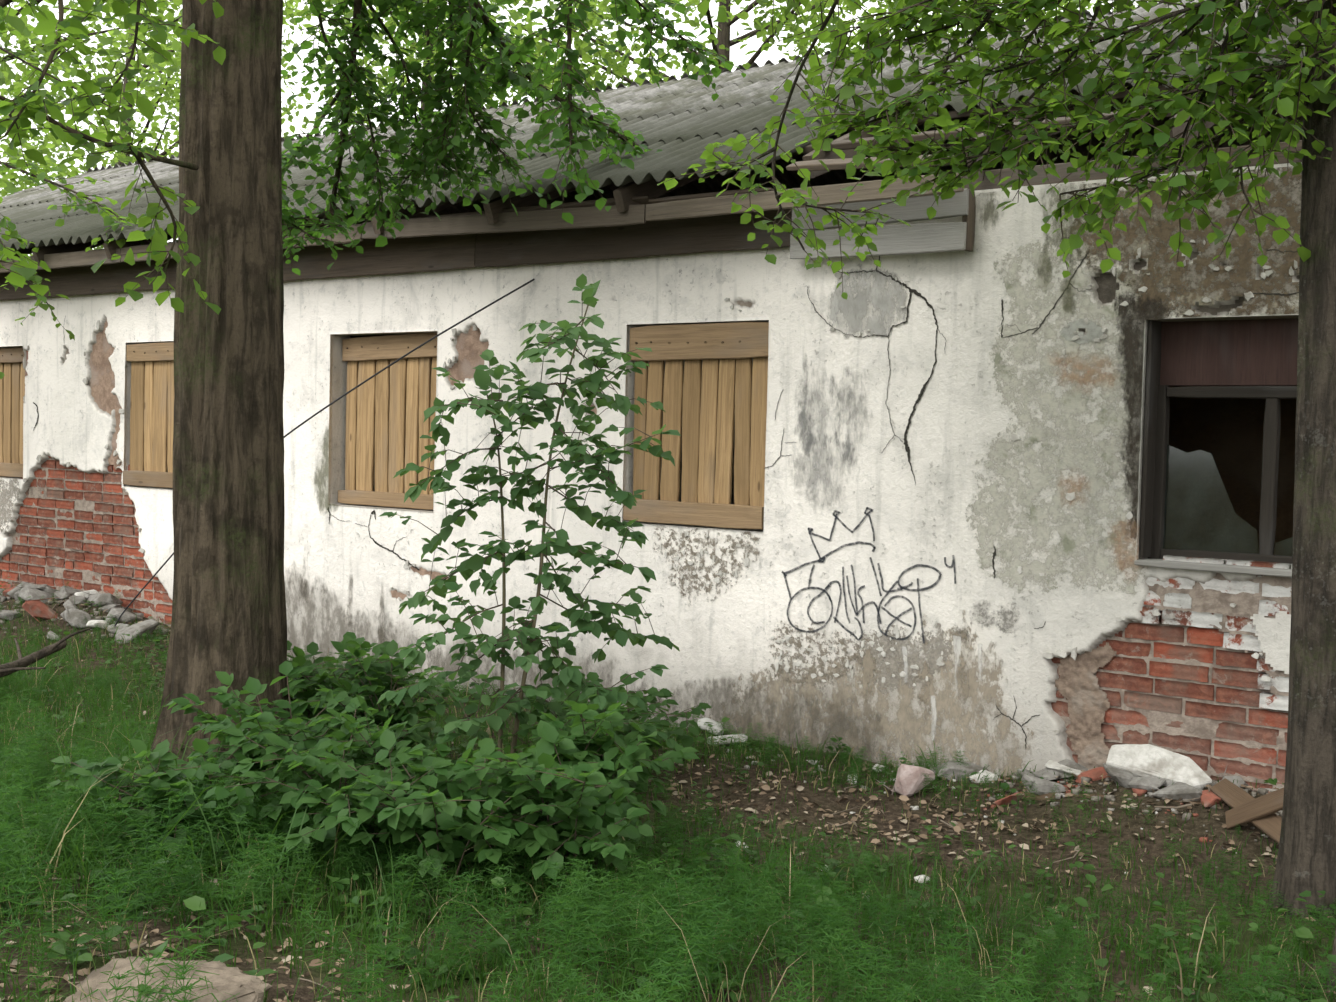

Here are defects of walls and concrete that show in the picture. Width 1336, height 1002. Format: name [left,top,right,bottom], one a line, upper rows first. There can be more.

spalling [0,318,172,628]
spalling [443,325,489,390]
leakage [797,392,852,499]
crack [807,256,946,484]
peeling [966,207,1292,808]
leakage [659,610,1034,776]